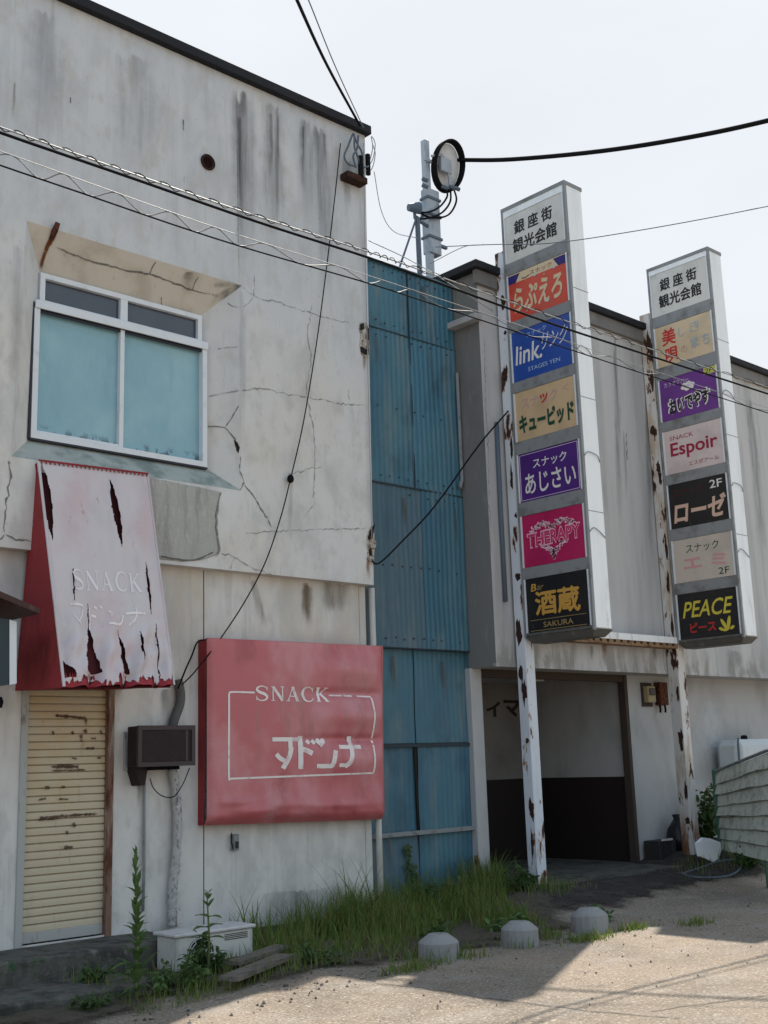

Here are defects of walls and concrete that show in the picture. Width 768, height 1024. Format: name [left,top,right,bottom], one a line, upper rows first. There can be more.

rust [40,222,60,267]
crack [60,249,203,305]
crack [0,462,31,542]
crack [161,388,353,565]